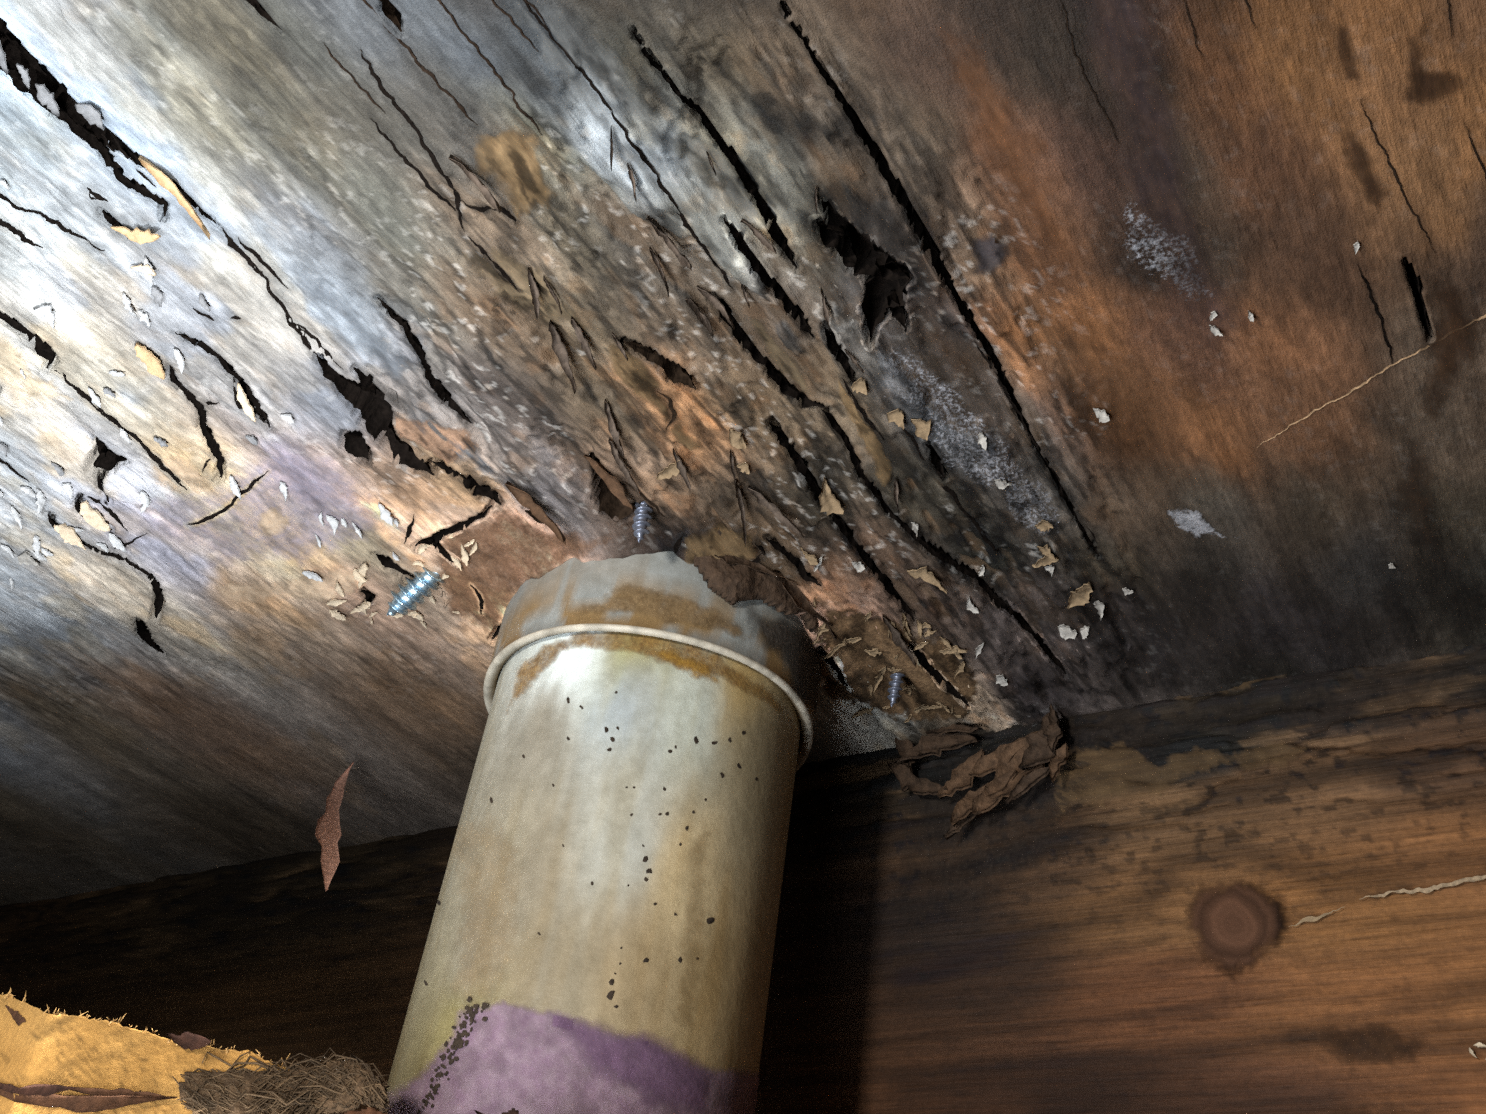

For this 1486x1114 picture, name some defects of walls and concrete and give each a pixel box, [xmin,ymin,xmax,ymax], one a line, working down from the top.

peeling [0,41,105,131]
crack [0,18,341,369]
leakage [974,235,1004,272]
leakage [1127,204,1209,296]
crack [0,309,271,525]
peeling [474,253,700,491]
crack [491,0,1100,707]
leakage [888,353,1059,533]
peeling [223,510,590,629]
crack [360,461,501,639]
rust [514,586,780,709]
peeling [813,599,984,723]